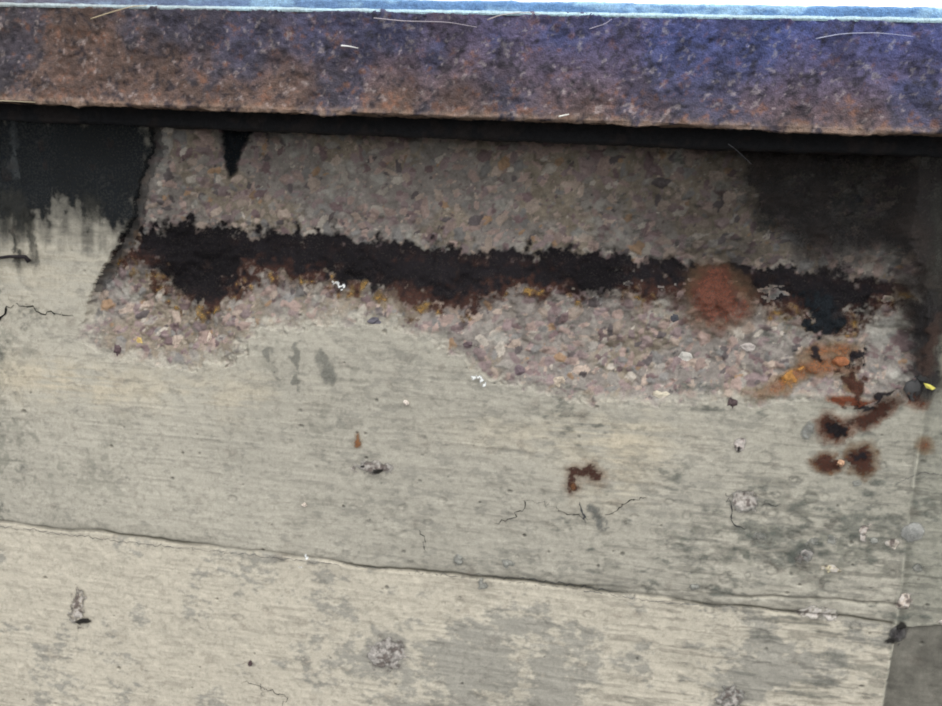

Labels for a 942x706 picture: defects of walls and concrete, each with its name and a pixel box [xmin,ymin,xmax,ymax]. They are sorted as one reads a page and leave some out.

leakage [0,120,156,265]
crack [0,303,73,319]
spalling [74,127,923,410]
corrosion [114,213,927,477]
corrosion [567,464,602,493]